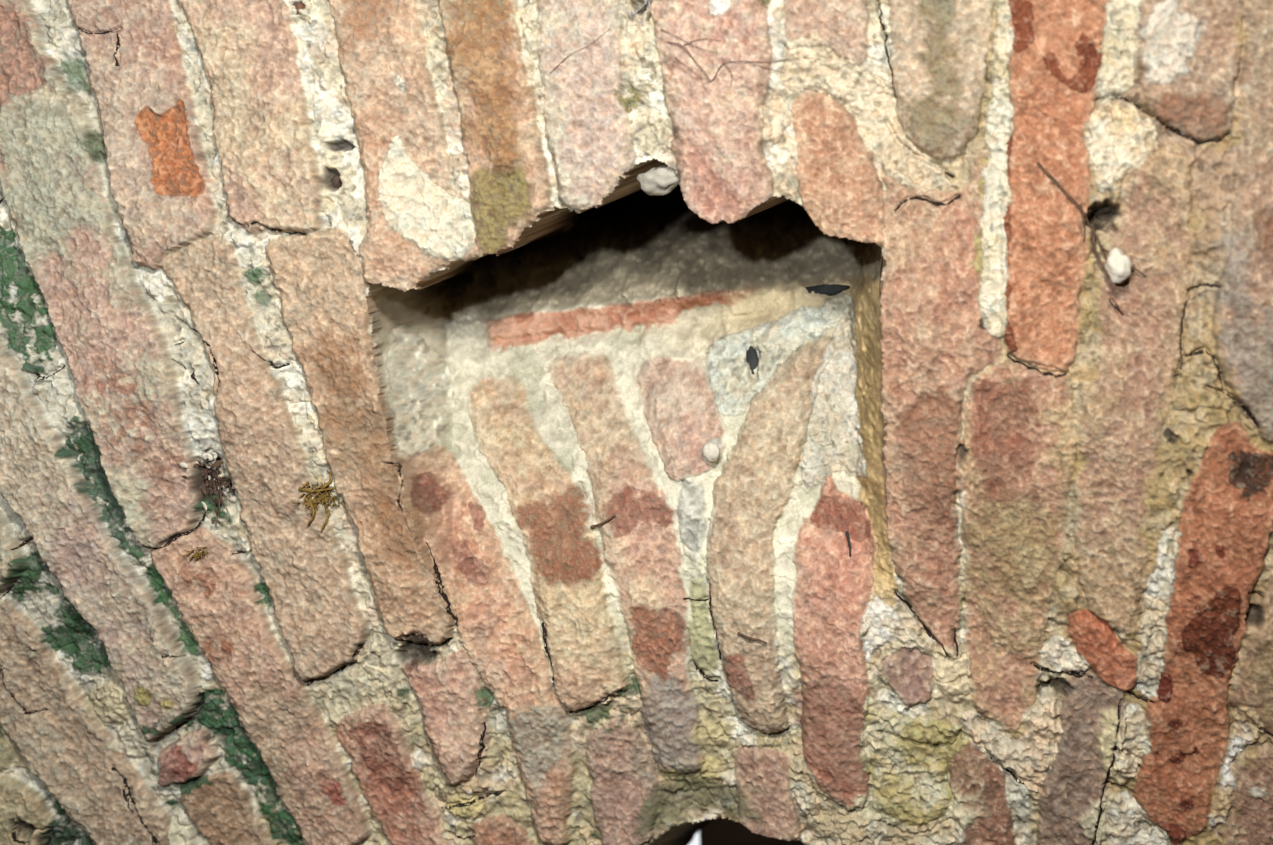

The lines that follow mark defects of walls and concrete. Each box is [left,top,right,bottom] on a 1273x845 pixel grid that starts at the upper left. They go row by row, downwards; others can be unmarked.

spalling [637,165,680,196]
peeling [772,178,797,201]
spalling [805,284,850,296]
spalling [746,346,758,374]
spalling [410,472,450,513]
spalling [469,502,486,531]
spalling [603,487,673,537]
spalling [452,541,490,586]